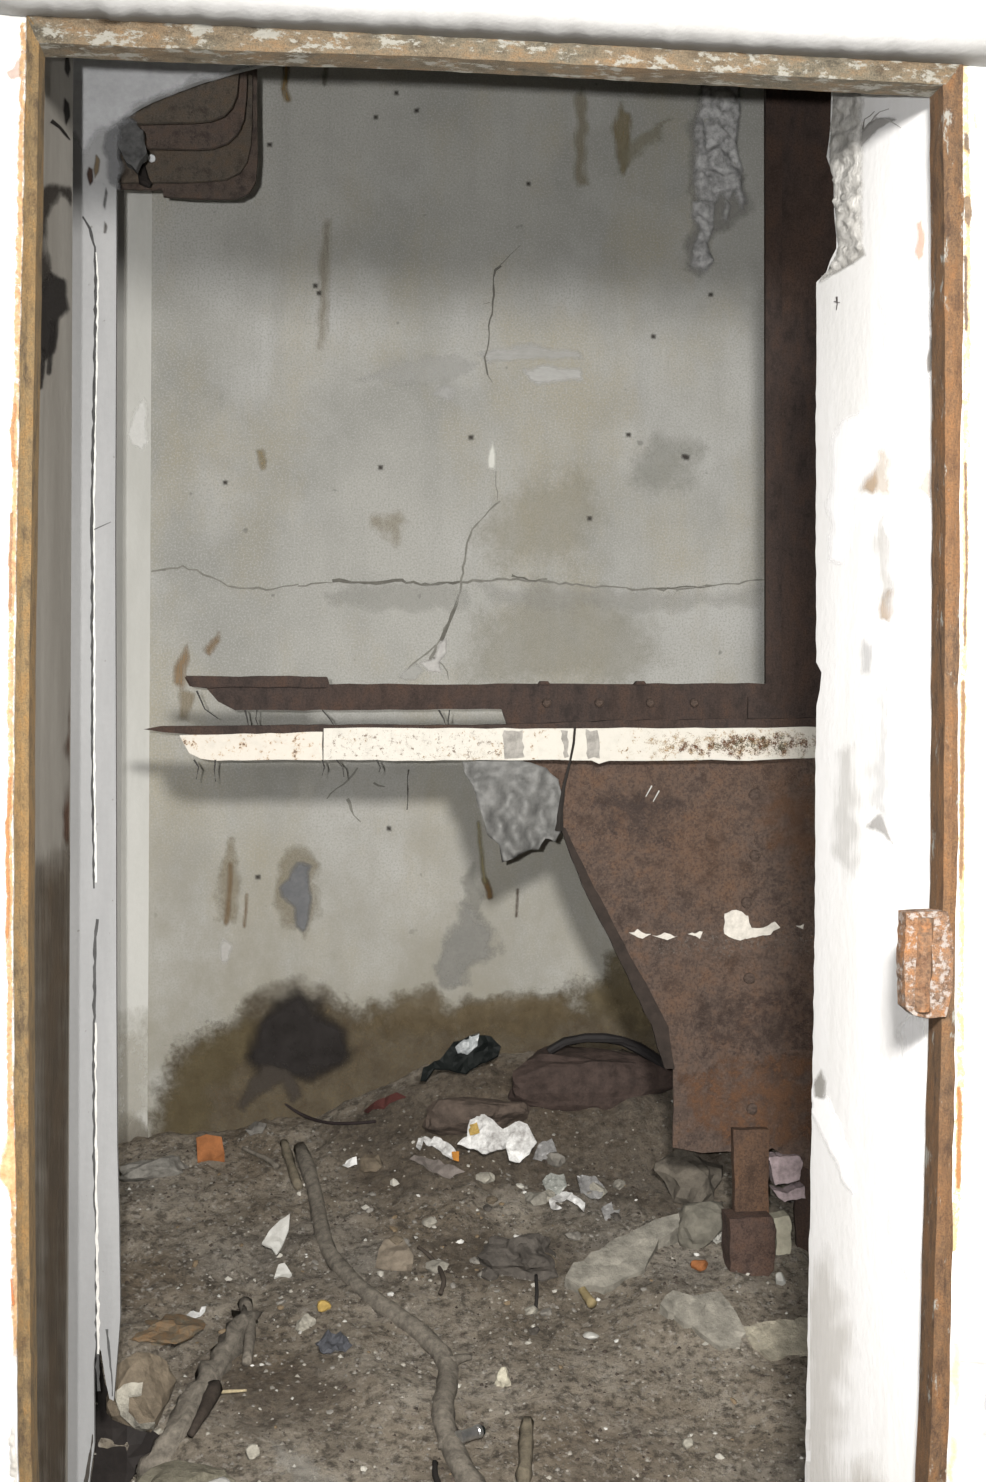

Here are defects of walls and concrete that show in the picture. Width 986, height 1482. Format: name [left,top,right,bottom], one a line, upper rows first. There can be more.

spalling [820,92,864,281]
crack [484,245,521,382]
crack [151,474,764,680]
corrosion [767,790,815,862]
damp [118,874,660,1145]